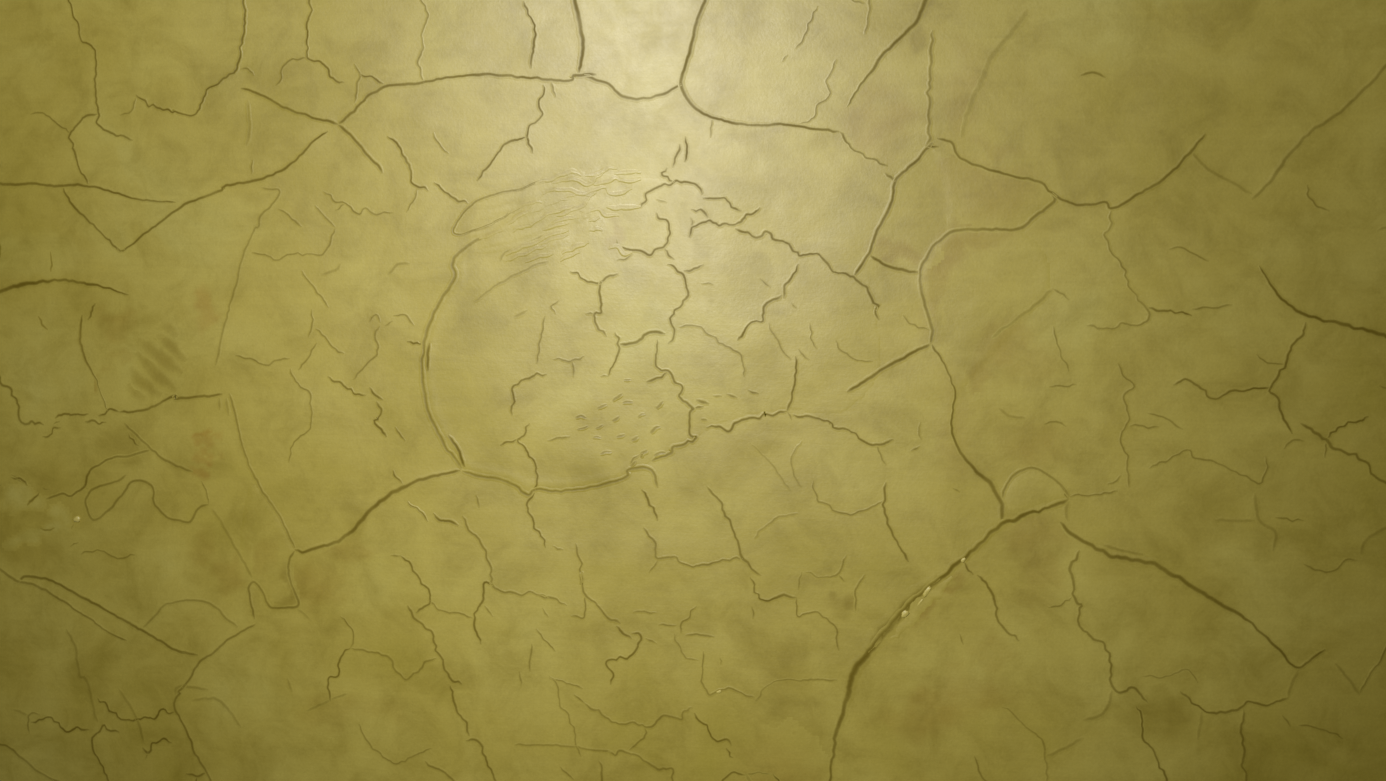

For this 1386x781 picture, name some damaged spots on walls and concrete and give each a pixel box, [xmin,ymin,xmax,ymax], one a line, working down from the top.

crack [0,0,1386,574]
crack [13,628,174,781]
crack [295,299,1361,781]